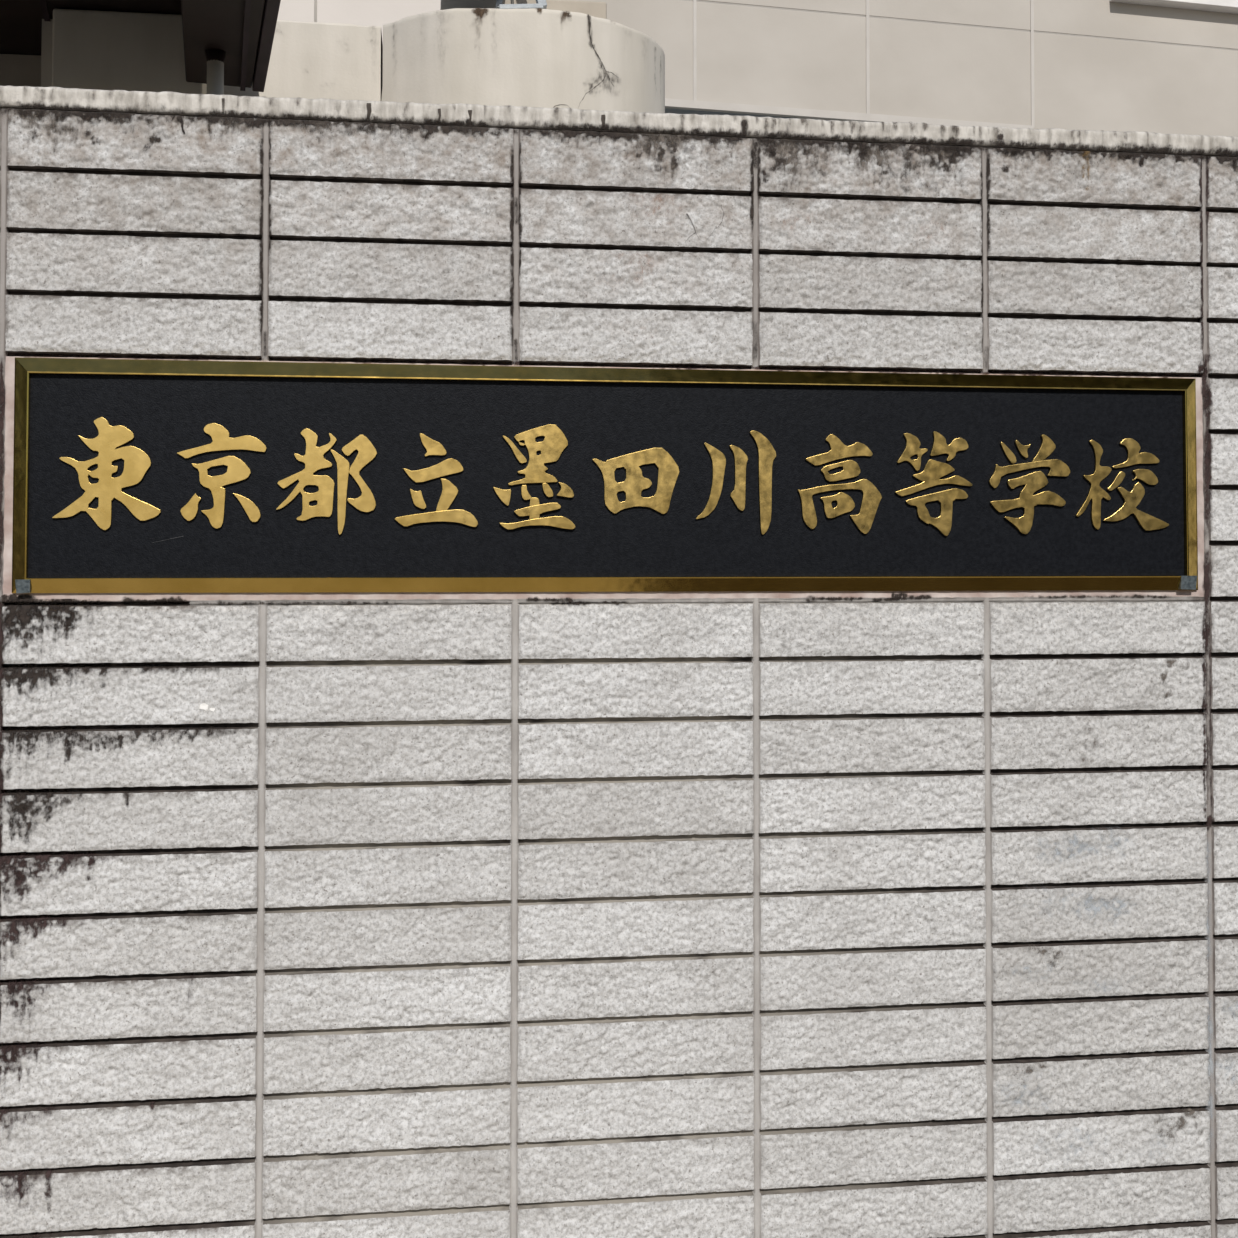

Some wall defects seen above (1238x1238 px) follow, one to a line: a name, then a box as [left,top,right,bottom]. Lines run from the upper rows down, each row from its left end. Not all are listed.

crack [553,15,614,125]
damp [0,89,1238,527]
damp [527,597,625,605]
damp [806,593,931,602]
damp [0,361,235,958]
damp [1200,552,1215,830]
damp [0,978,45,1019]
damp [0,1041,40,1081]
damp [0,1105,53,1128]
damp [2,1168,52,1208]